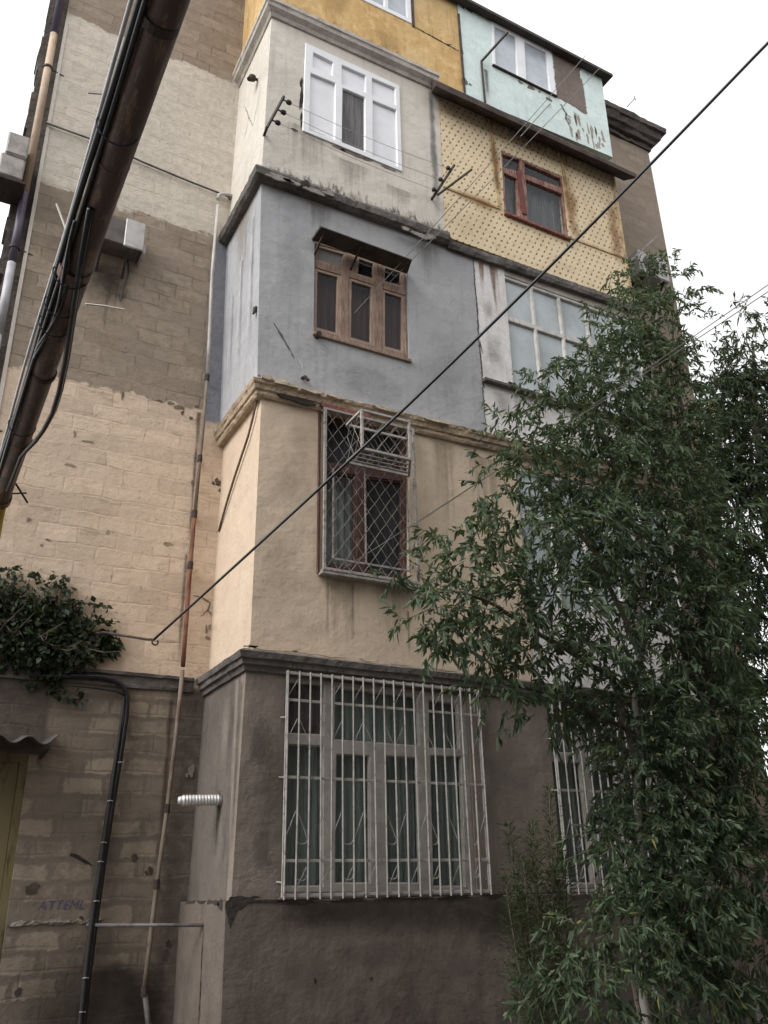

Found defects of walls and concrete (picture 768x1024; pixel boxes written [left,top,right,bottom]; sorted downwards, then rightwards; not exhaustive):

peeling [518,53,605,150]
spalling [186,895,365,928]